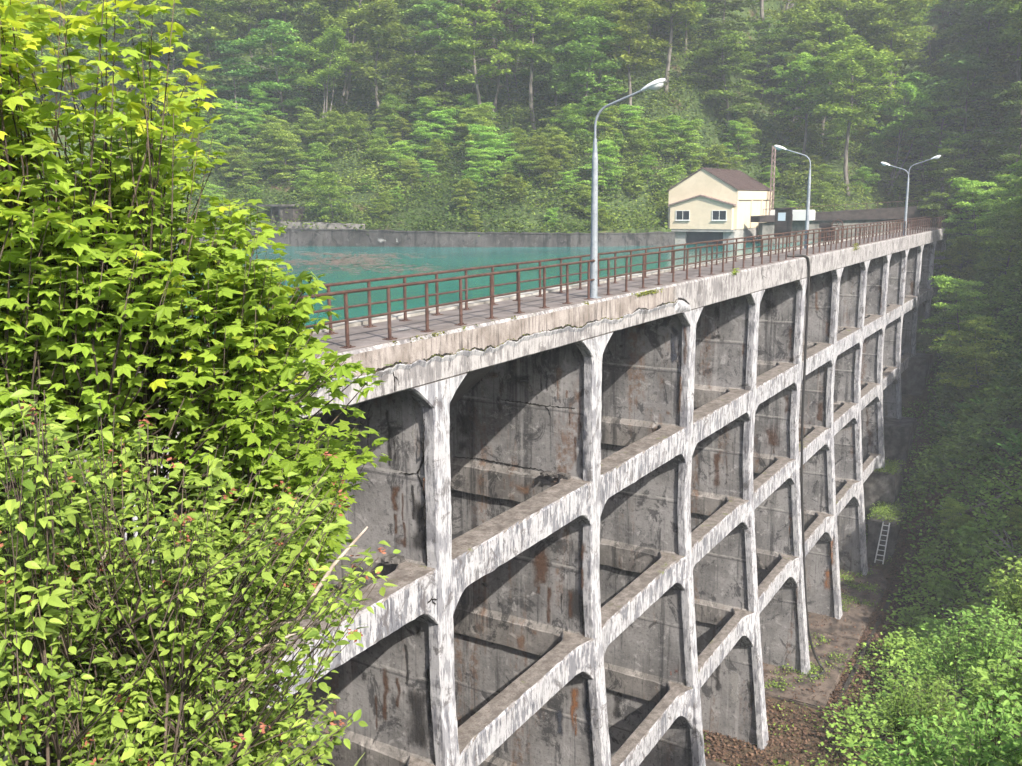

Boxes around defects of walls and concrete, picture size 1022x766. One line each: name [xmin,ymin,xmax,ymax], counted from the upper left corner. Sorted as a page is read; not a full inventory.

crack [401,419,427,542]
rust [392,487,406,547]
rust [375,672,400,729]
water stain [405,645,431,747]
rust [570,689,578,735]